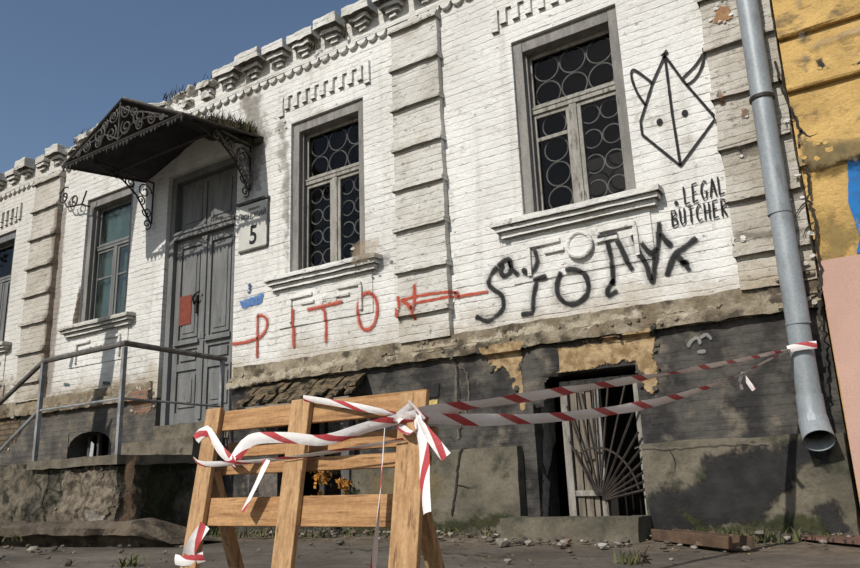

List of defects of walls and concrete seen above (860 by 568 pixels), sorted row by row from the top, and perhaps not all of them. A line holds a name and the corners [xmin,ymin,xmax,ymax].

spalling [708,3,733,24]
flaking render [381,303,722,411]
flaking render [541,386,556,517]
water stain [648,439,831,531]
water stain [812,499,860,534]